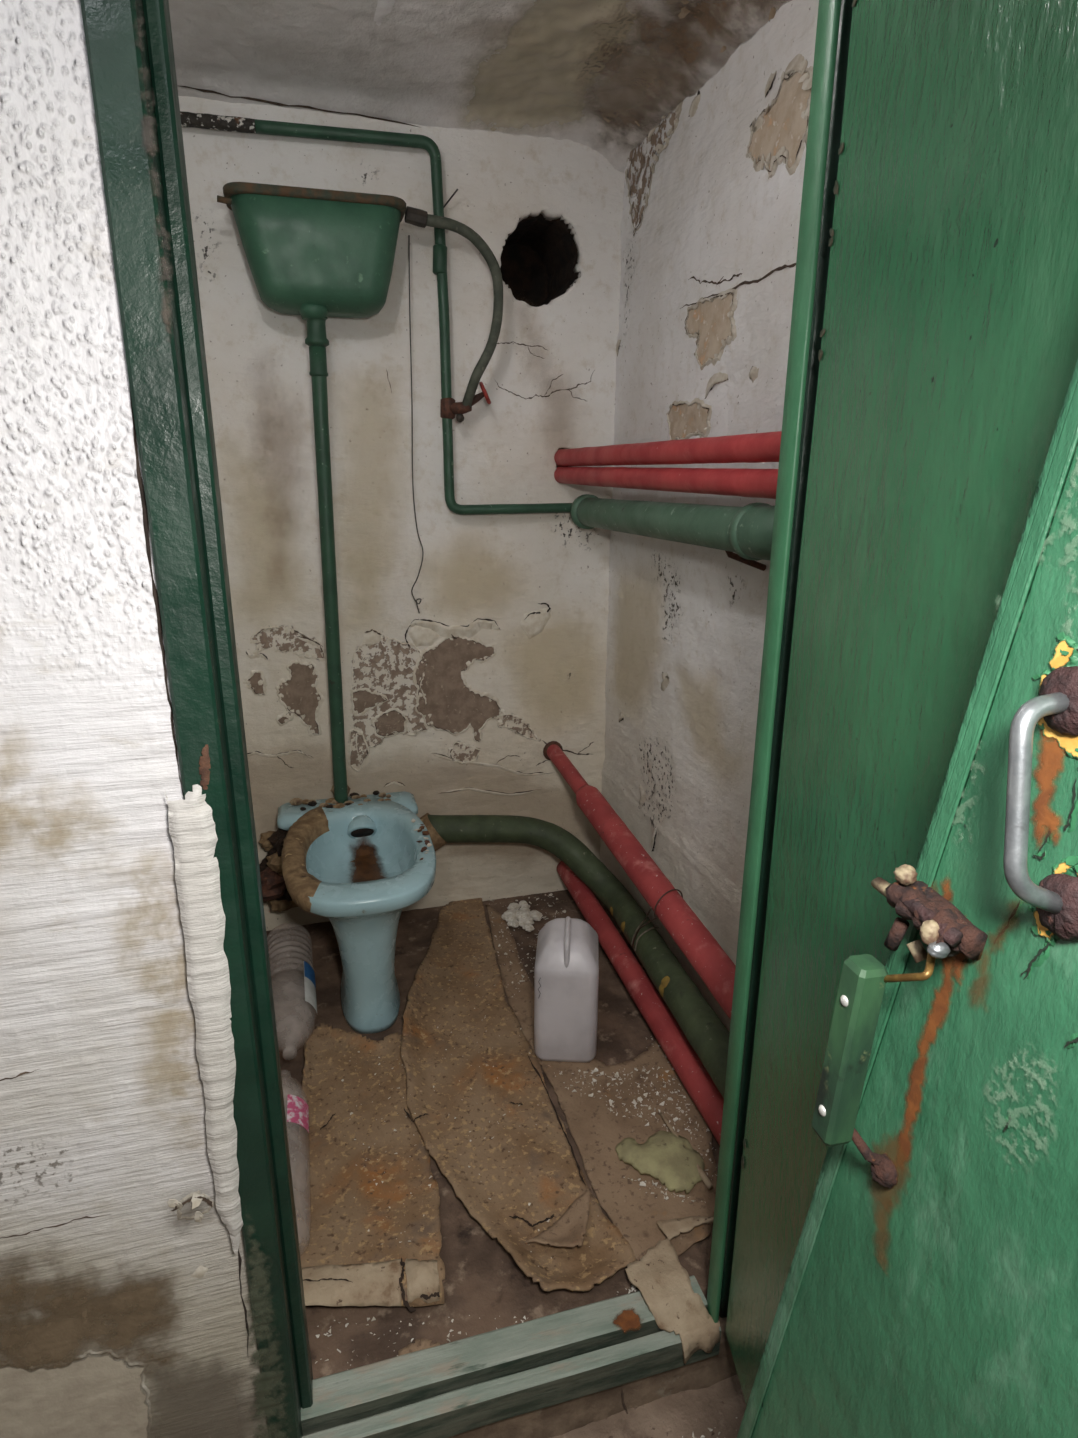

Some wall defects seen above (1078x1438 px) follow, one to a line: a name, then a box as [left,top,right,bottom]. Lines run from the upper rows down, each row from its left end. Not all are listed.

damp [470,0,729,136]
peeling [625,98,684,236]
peeling [746,59,813,179]
peeling [685,287,737,370]
crack [680,263,796,309]
peeling [666,398,712,440]
peeling [243,625,327,738]
peeling [348,635,540,772]
damp [0,1275,252,1438]